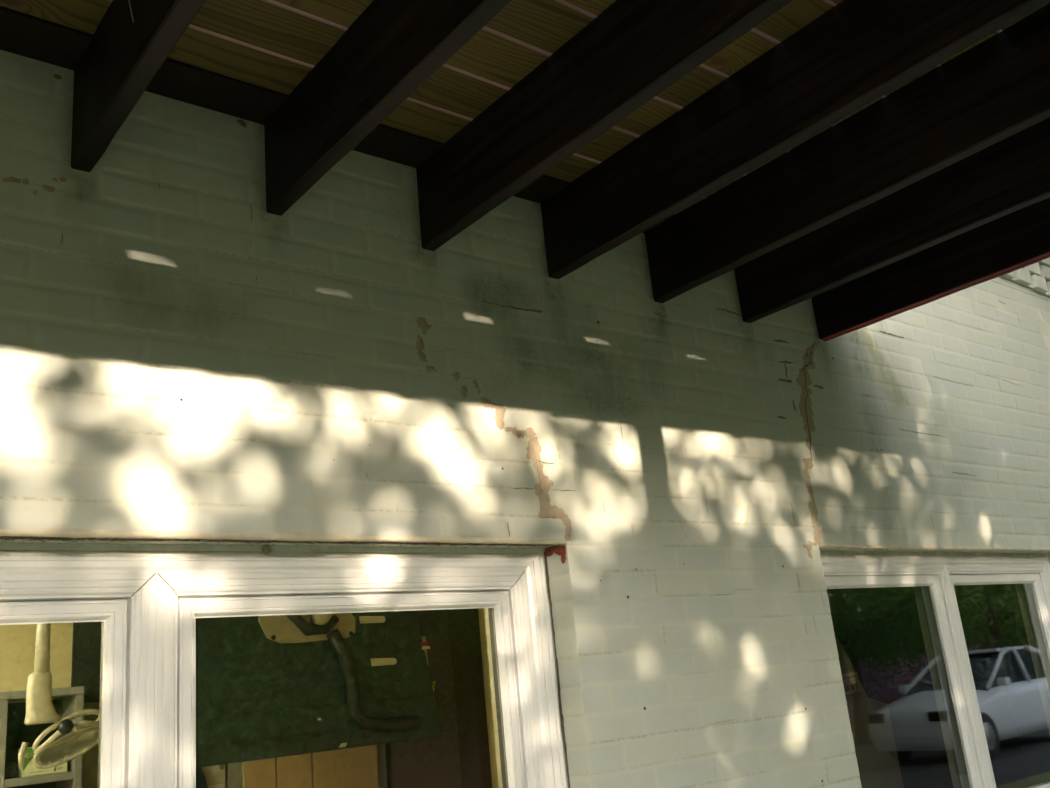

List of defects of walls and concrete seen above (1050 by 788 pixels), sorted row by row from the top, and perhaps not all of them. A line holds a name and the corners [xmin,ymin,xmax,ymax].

rust [0,536,560,549]
crack [415,316,576,788]
crack [774,340,824,585]